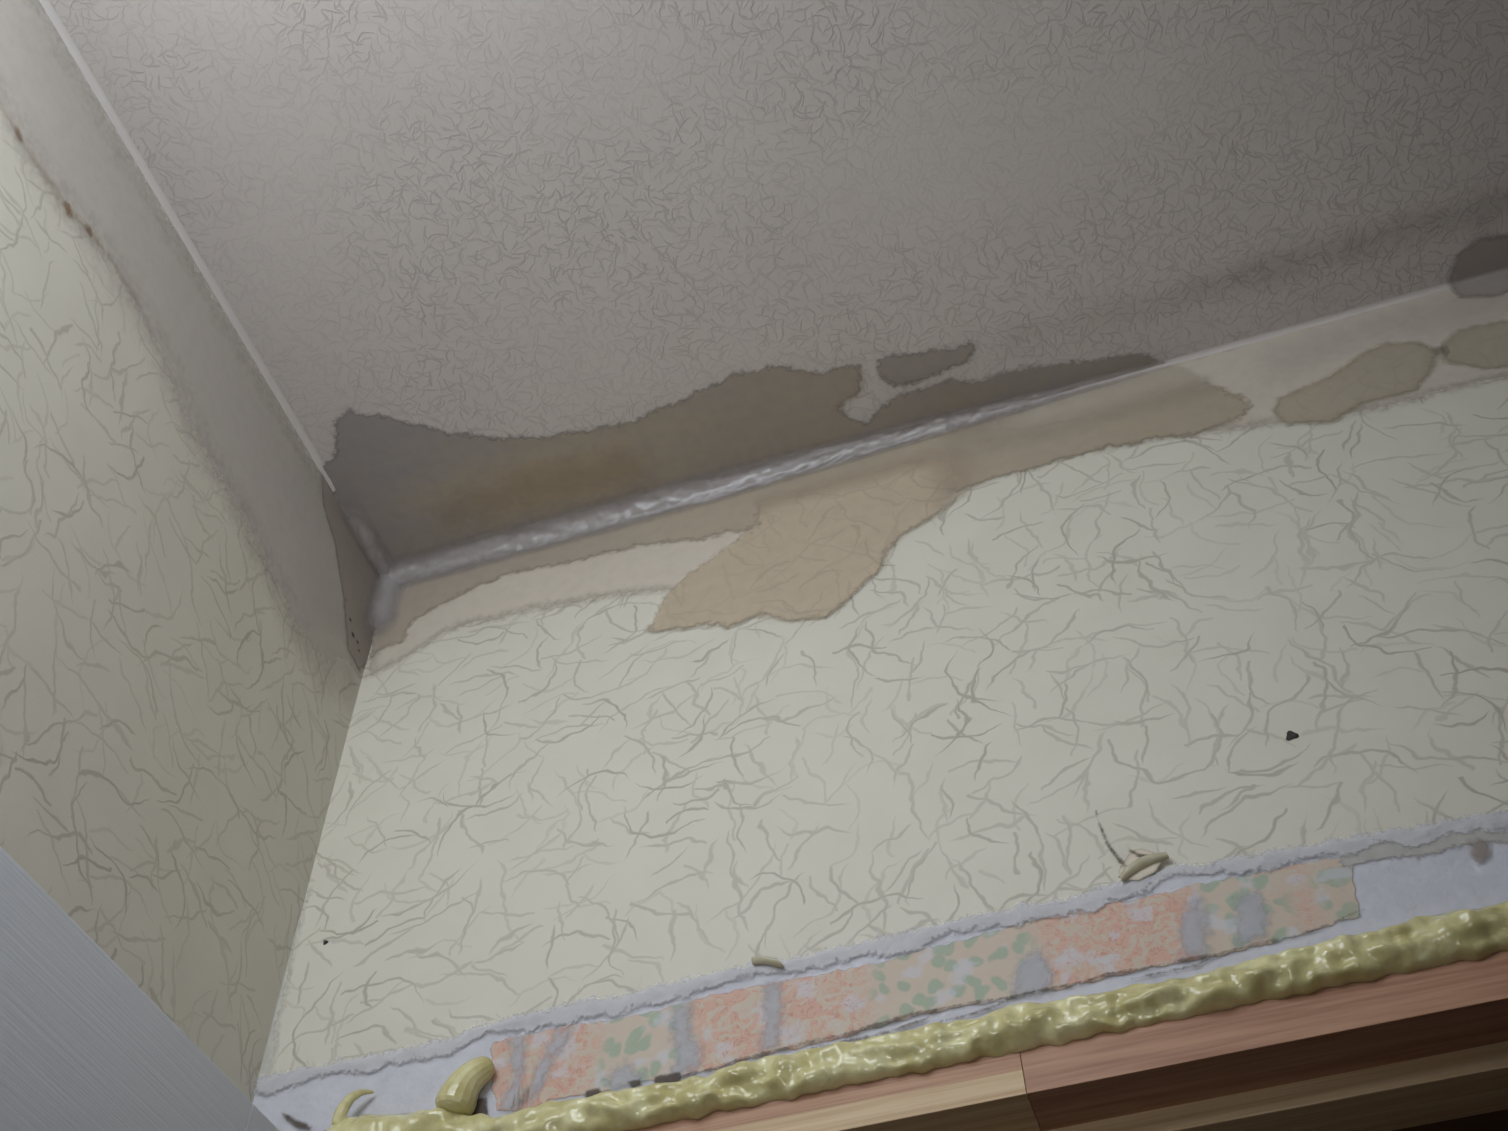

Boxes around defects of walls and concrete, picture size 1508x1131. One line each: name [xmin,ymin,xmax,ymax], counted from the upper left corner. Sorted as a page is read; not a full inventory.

water stain [322,344,1250,669]
water stain [1274,321,1508,424]
water stain [1450,236,1508,297]
peeling [252,810,1508,1131]